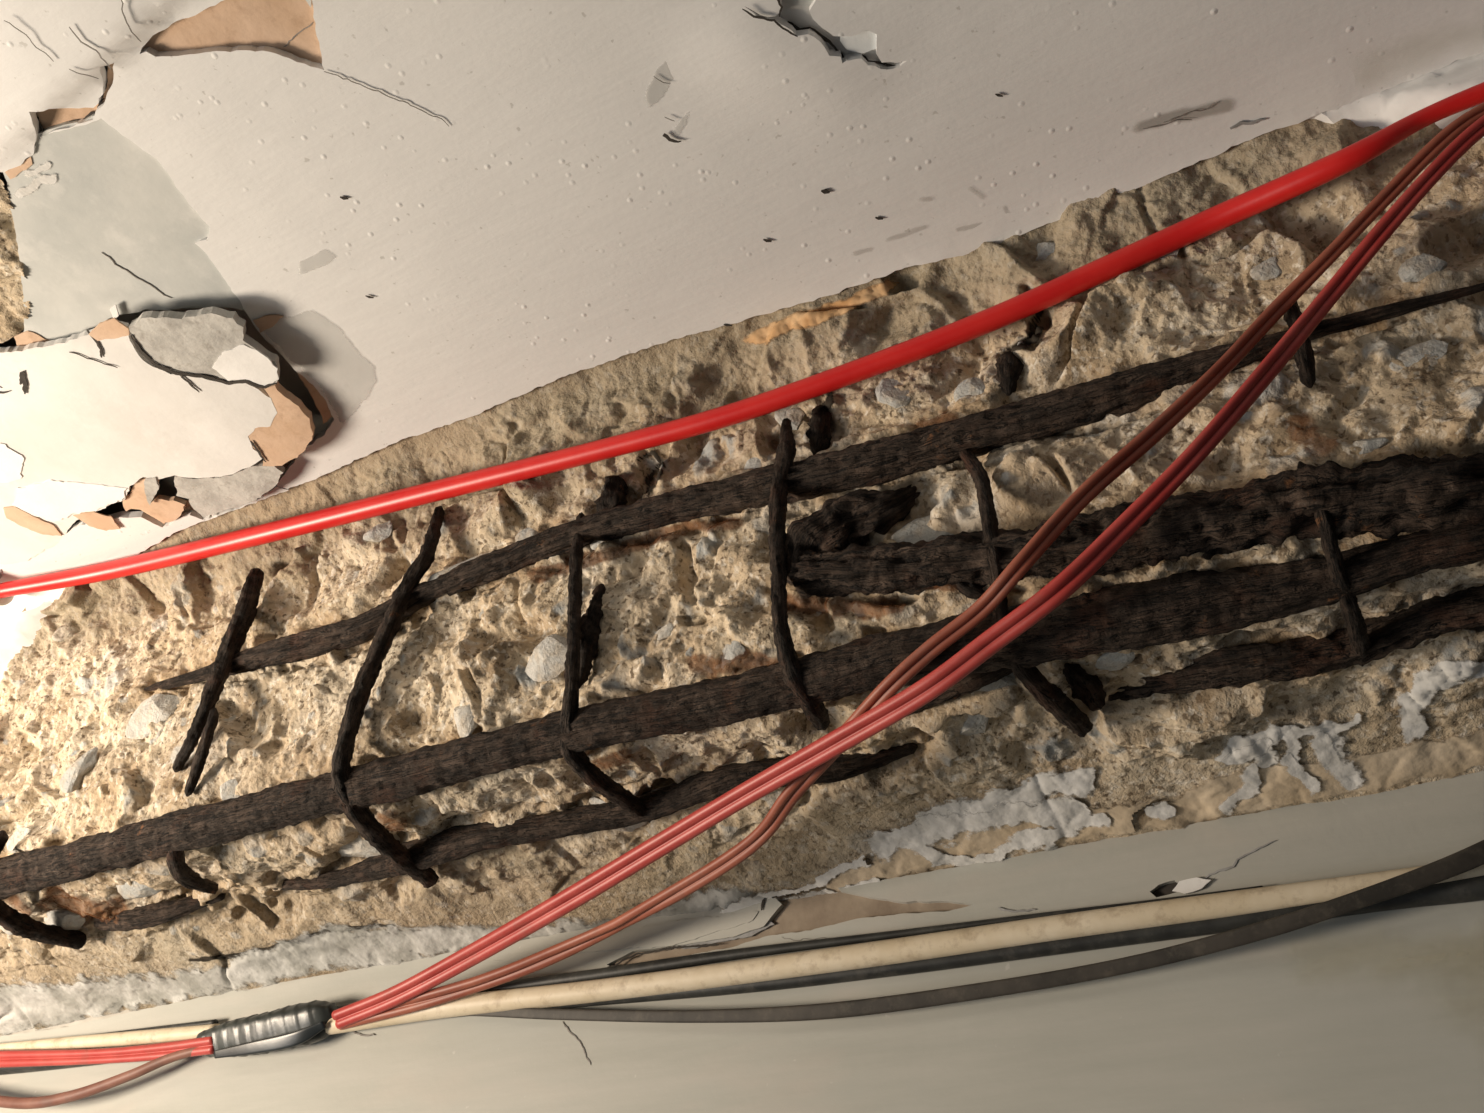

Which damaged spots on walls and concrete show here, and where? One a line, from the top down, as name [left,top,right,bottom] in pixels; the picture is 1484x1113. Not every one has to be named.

peeling [1143,102,1215,129]
peeling [0,63,244,346]
rust [1289,414,1336,455]
rust [528,519,740,583]
spalling [0,119,1484,991]
rust [787,595,904,619]
rust [688,651,779,679]
rust [593,749,631,769]
rust [377,811,405,831]
rust [7,886,126,925]
spalling [81,993,217,1018]